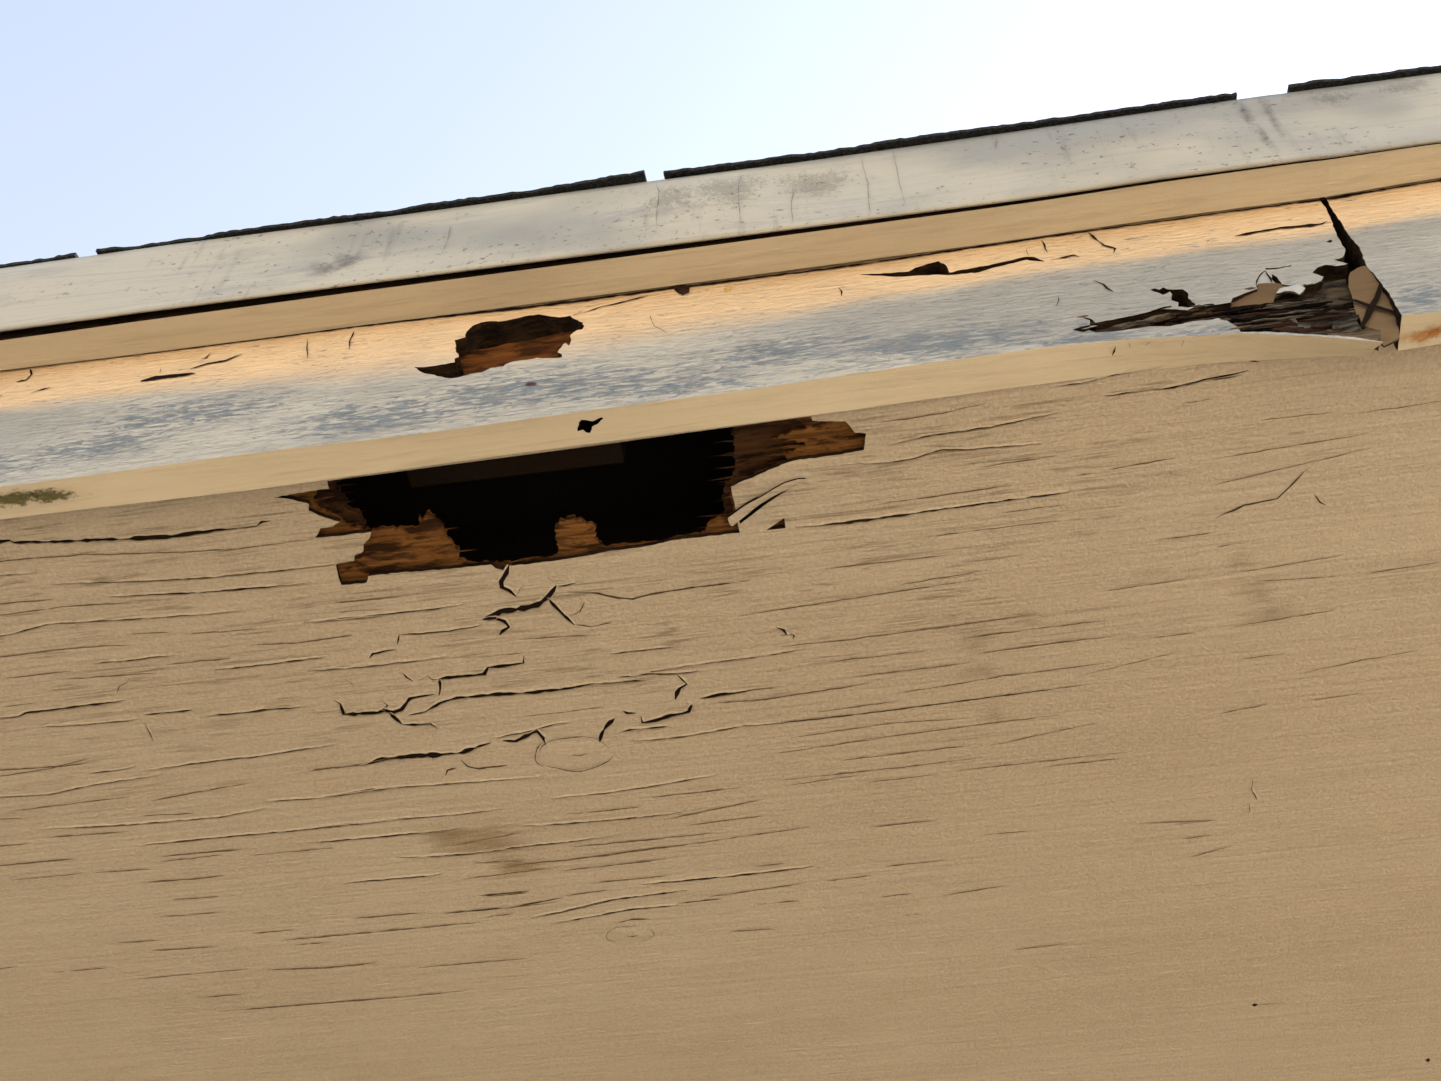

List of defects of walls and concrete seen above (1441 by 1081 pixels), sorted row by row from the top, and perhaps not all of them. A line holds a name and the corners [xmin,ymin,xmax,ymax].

crack [0,180,1441,396]
peeling [1192,271,1305,330]
peeling [1346,266,1399,348]
spalling [334,417,735,562]
crack [0,341,1261,1011]